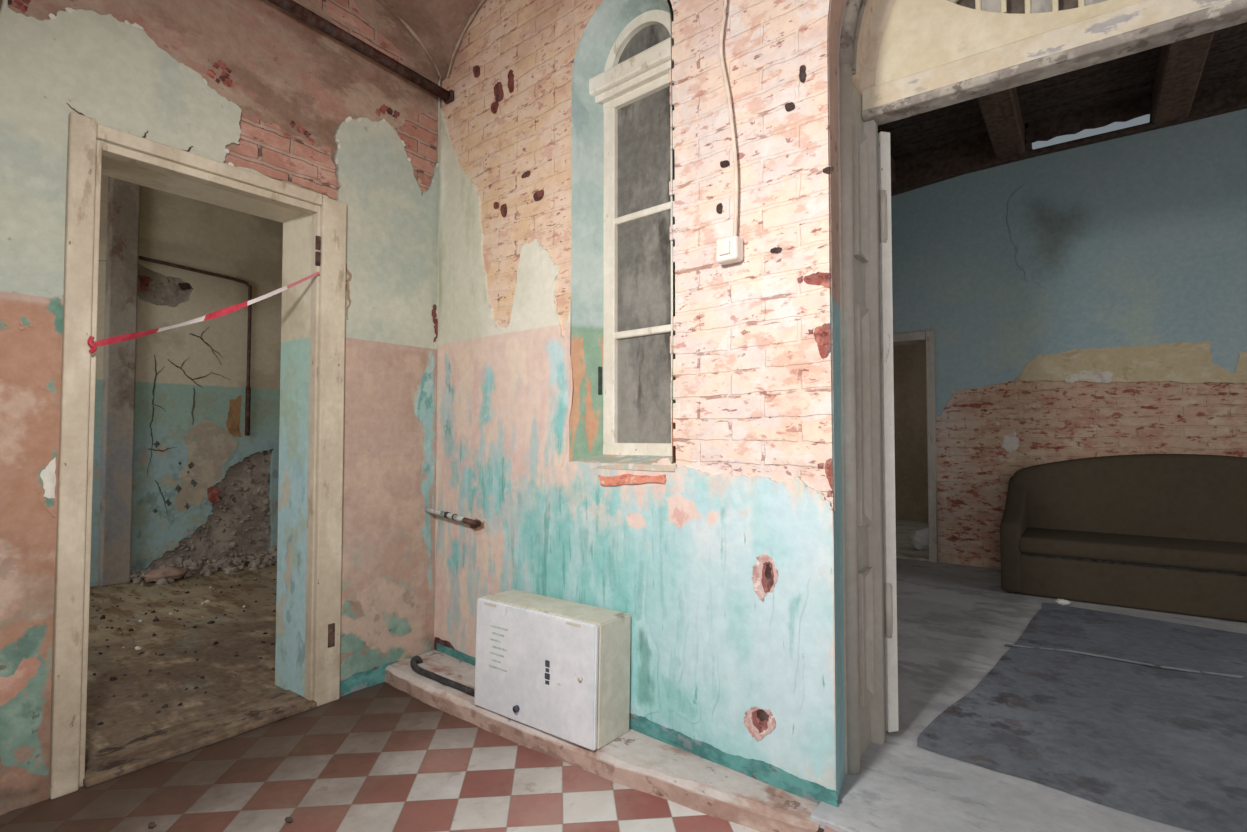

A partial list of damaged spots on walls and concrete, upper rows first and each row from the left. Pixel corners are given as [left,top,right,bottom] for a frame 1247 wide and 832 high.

damp [1007,181,1108,290]
crack [147,327,230,515]
flaking render [0,0,835,790]
flaking render [936,340,1247,568]